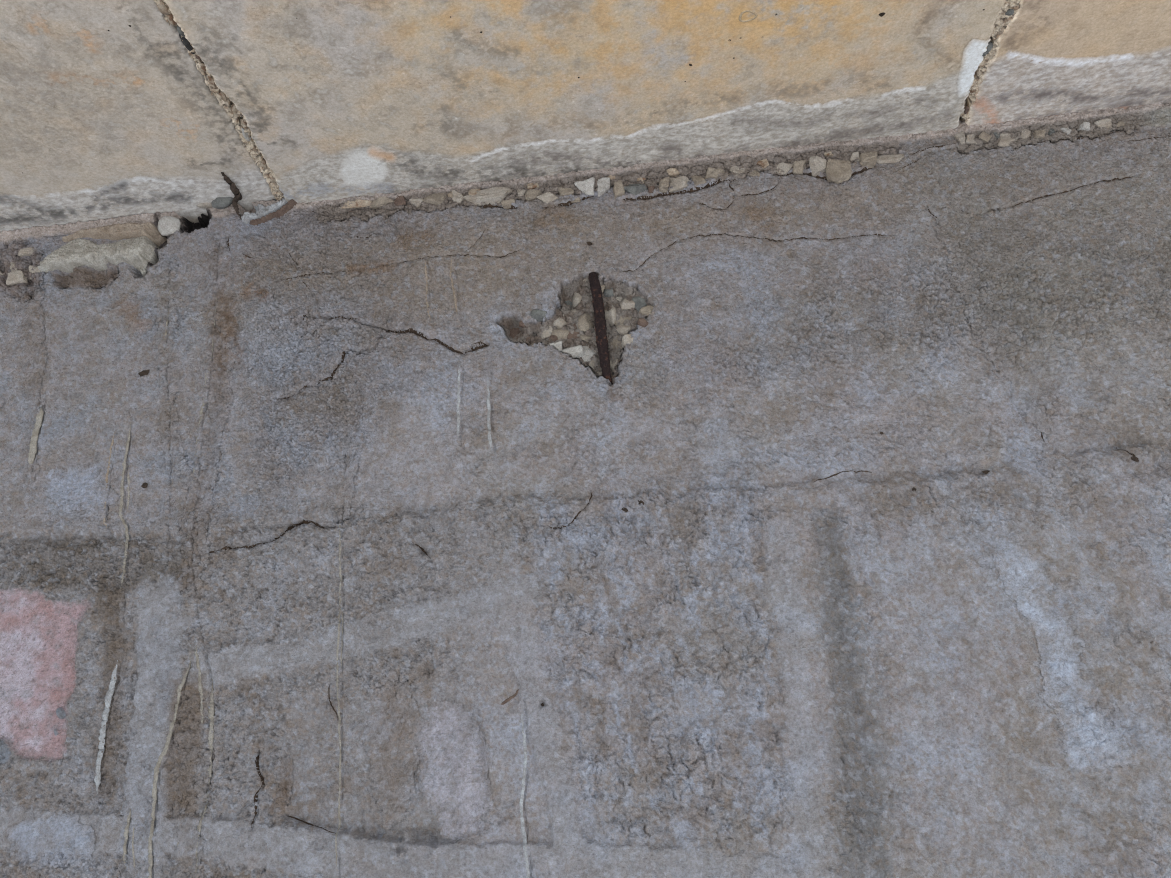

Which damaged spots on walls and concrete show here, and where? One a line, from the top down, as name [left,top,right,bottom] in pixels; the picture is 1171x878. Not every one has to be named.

peeling [241,198,297,226]
crack [621,143,955,272]
spalling [0,241,119,304]
crack [279,196,594,320]
crack [386,328,488,355]
spalling [495,273,654,384]
corrosion [589,272,624,403]
crack [278,351,346,399]
crack [209,519,336,553]